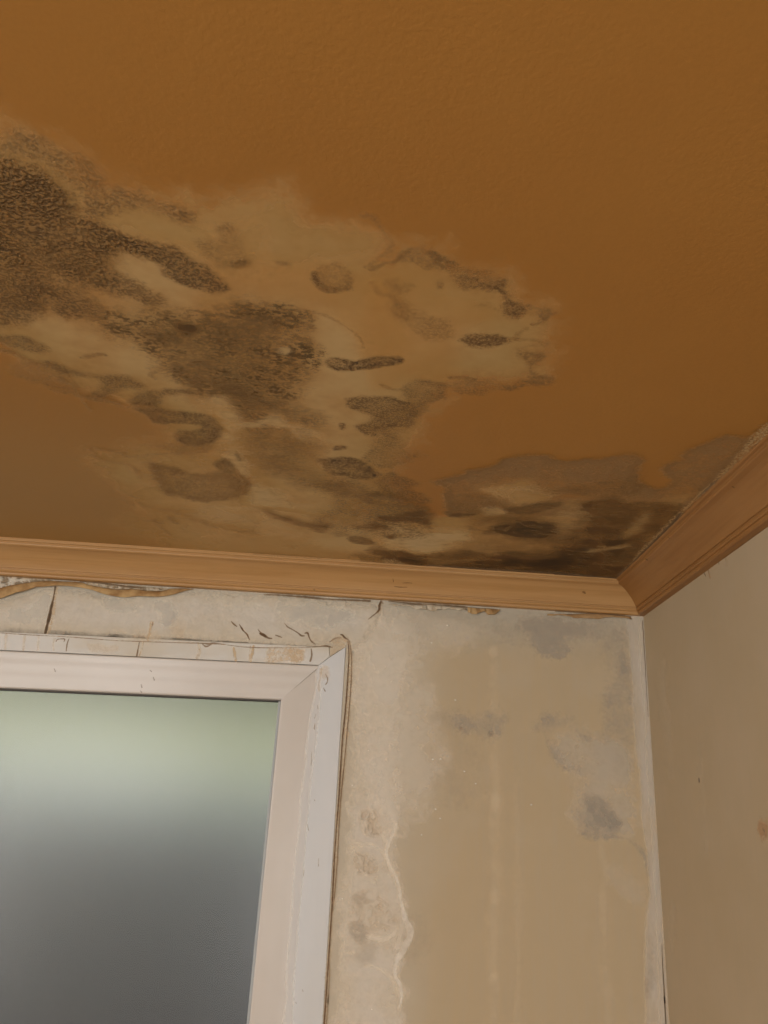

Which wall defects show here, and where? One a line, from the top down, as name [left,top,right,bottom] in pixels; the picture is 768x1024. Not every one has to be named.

water stain [0,131,751,577]
flaking render [0,576,51,588]
crack [44,586,56,634]
flaking render [80,581,168,591]
flaking render [264,594,371,602]
crack [231,621,352,1024]
water stain [347,799,414,1009]